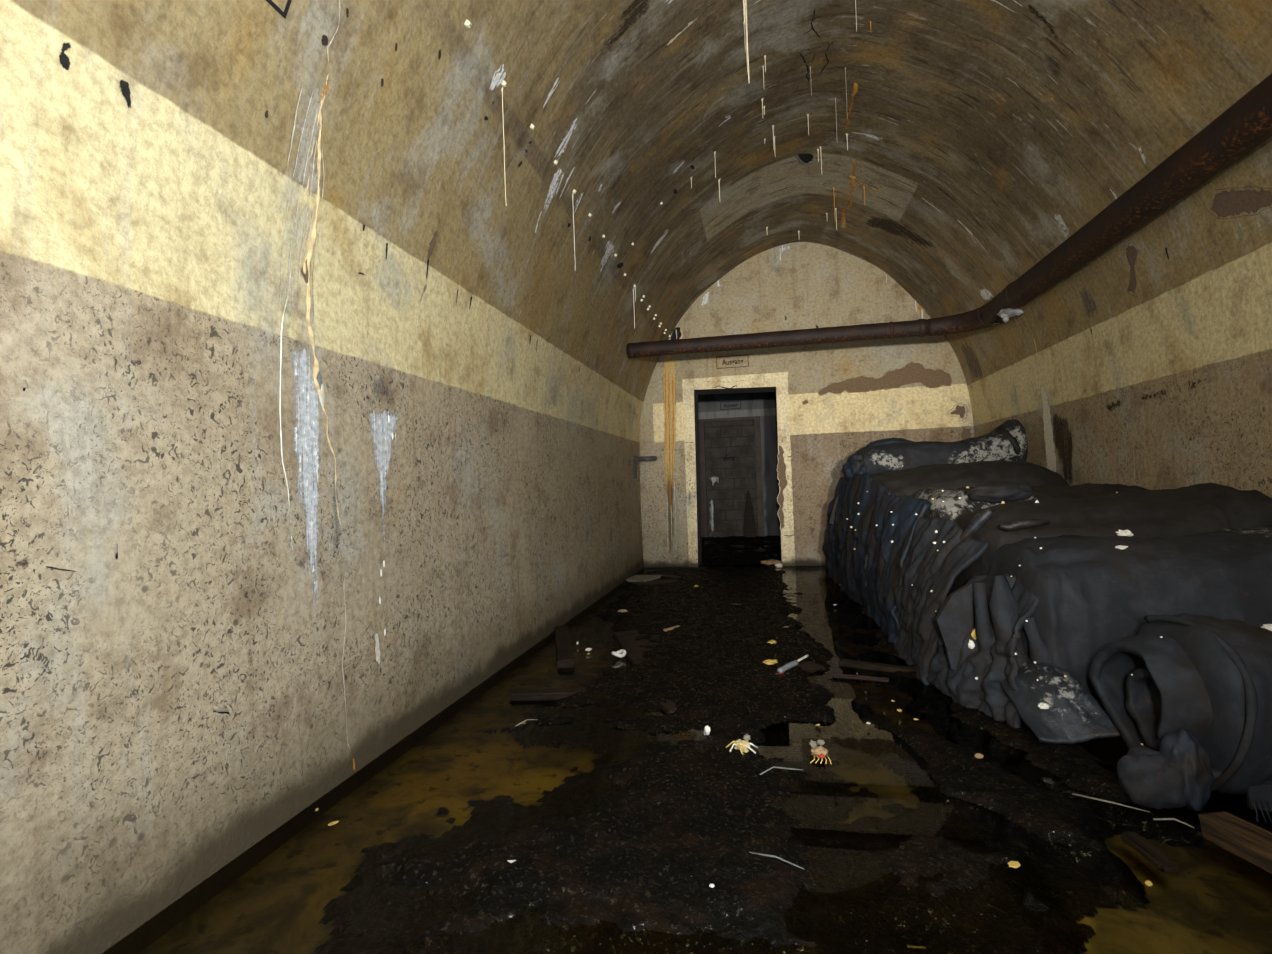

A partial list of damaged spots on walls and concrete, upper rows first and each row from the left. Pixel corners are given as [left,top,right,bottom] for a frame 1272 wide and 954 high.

damp [292,349,322,603]
damp [370,410,397,540]
damp [375,629,386,664]